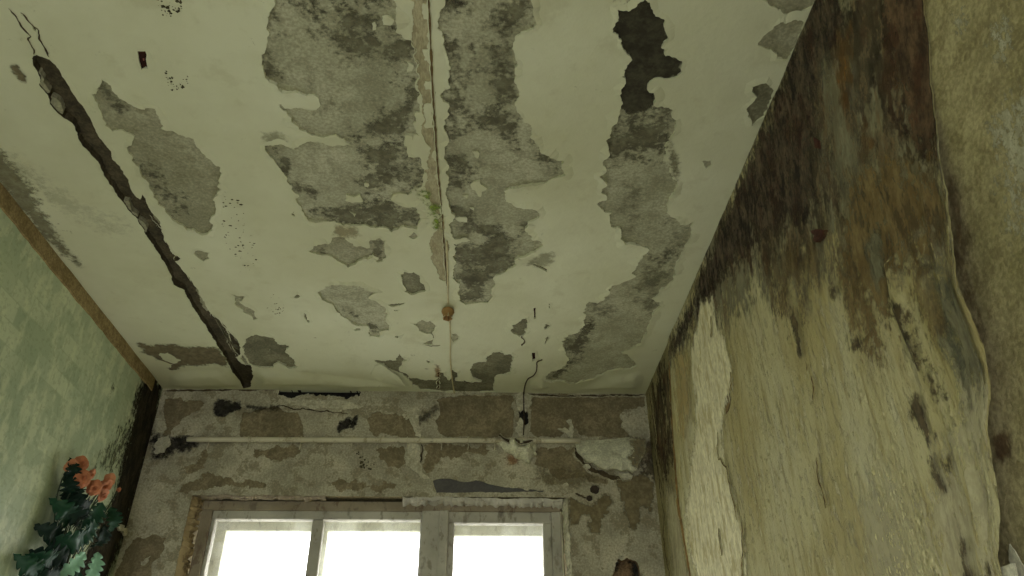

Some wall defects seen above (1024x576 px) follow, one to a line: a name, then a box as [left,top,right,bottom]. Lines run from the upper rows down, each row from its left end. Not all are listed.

peeling [87,76,228,262]
peeling [230,0,700,503]
damp [540,0,985,534]
flaking render [153,395,208,454]
flaking render [178,448,268,495]
damp [959,538,971,576]